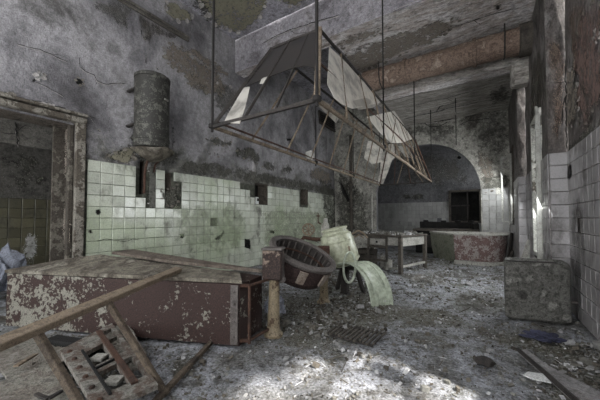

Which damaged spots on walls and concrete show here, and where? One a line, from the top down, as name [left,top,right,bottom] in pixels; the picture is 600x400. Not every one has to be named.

flaking render [198,0,267,35]
crack [19,44,125,85]
flaking render [162,42,237,115]
spalling [160,184,181,208]